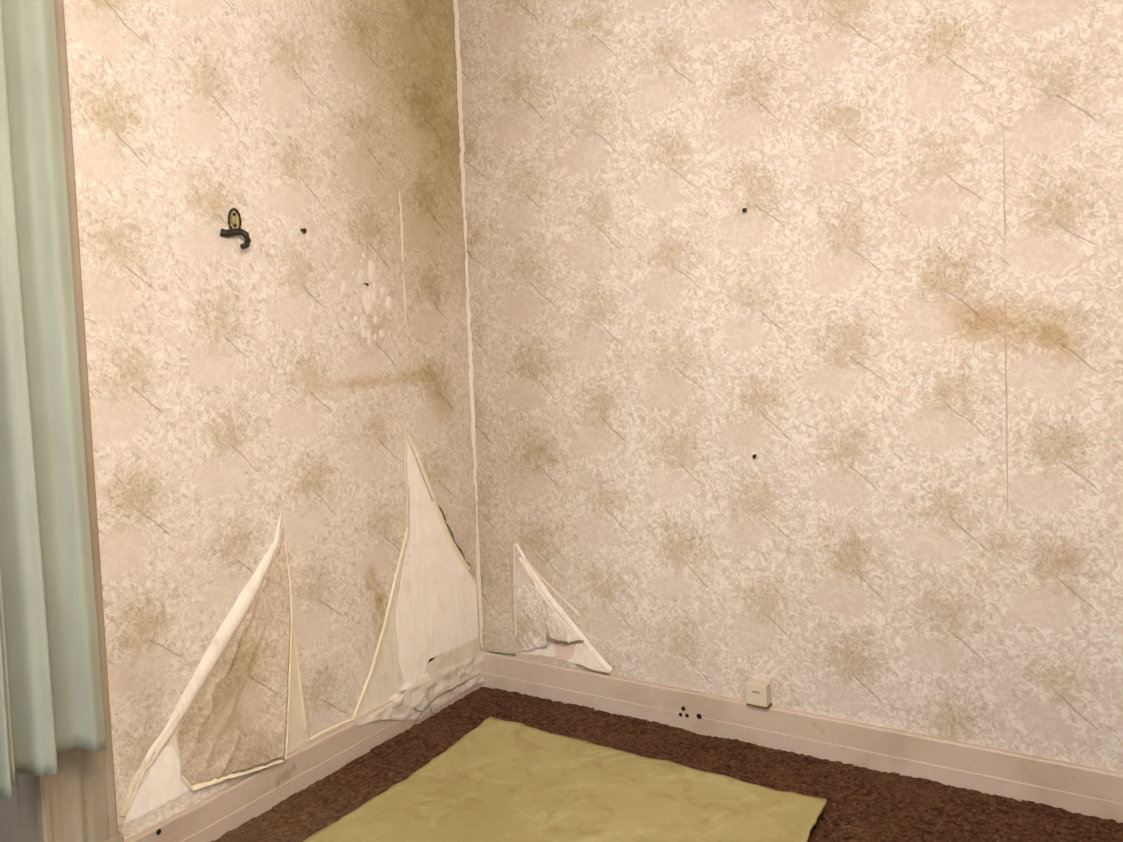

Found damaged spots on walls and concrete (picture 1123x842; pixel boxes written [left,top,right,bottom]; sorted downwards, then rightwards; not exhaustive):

spalling [355,436,484,726]
flaking render [519,635,578,664]
flaking render [124,720,191,823]